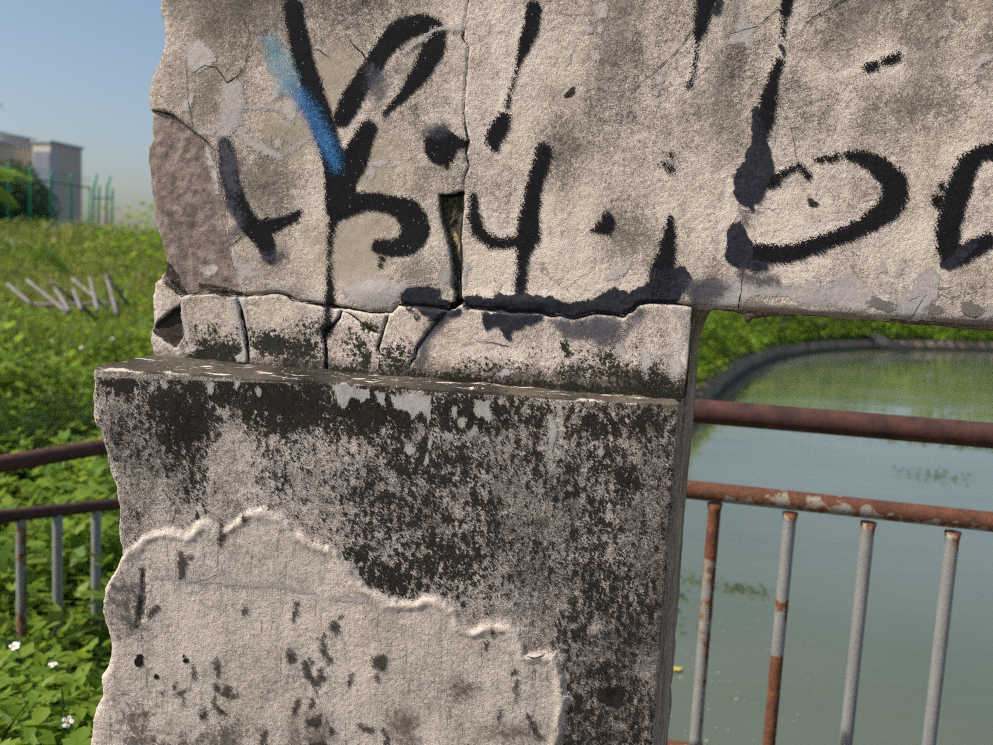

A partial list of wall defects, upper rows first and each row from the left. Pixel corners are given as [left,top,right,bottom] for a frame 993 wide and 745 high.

crack [156,17,250,216]
crack [461,3,469,191]
crack [629,28,694,96]
flaking render [148,87,326,348]
crack [166,236,462,376]
crack [546,295,692,349]
peeling [175,548,195,580]
water stain [96,377,678,745]
peeling [154,655,199,707]
peeling [197,656,238,721]
peeling [284,614,344,745]
peeling [370,654,390,684]